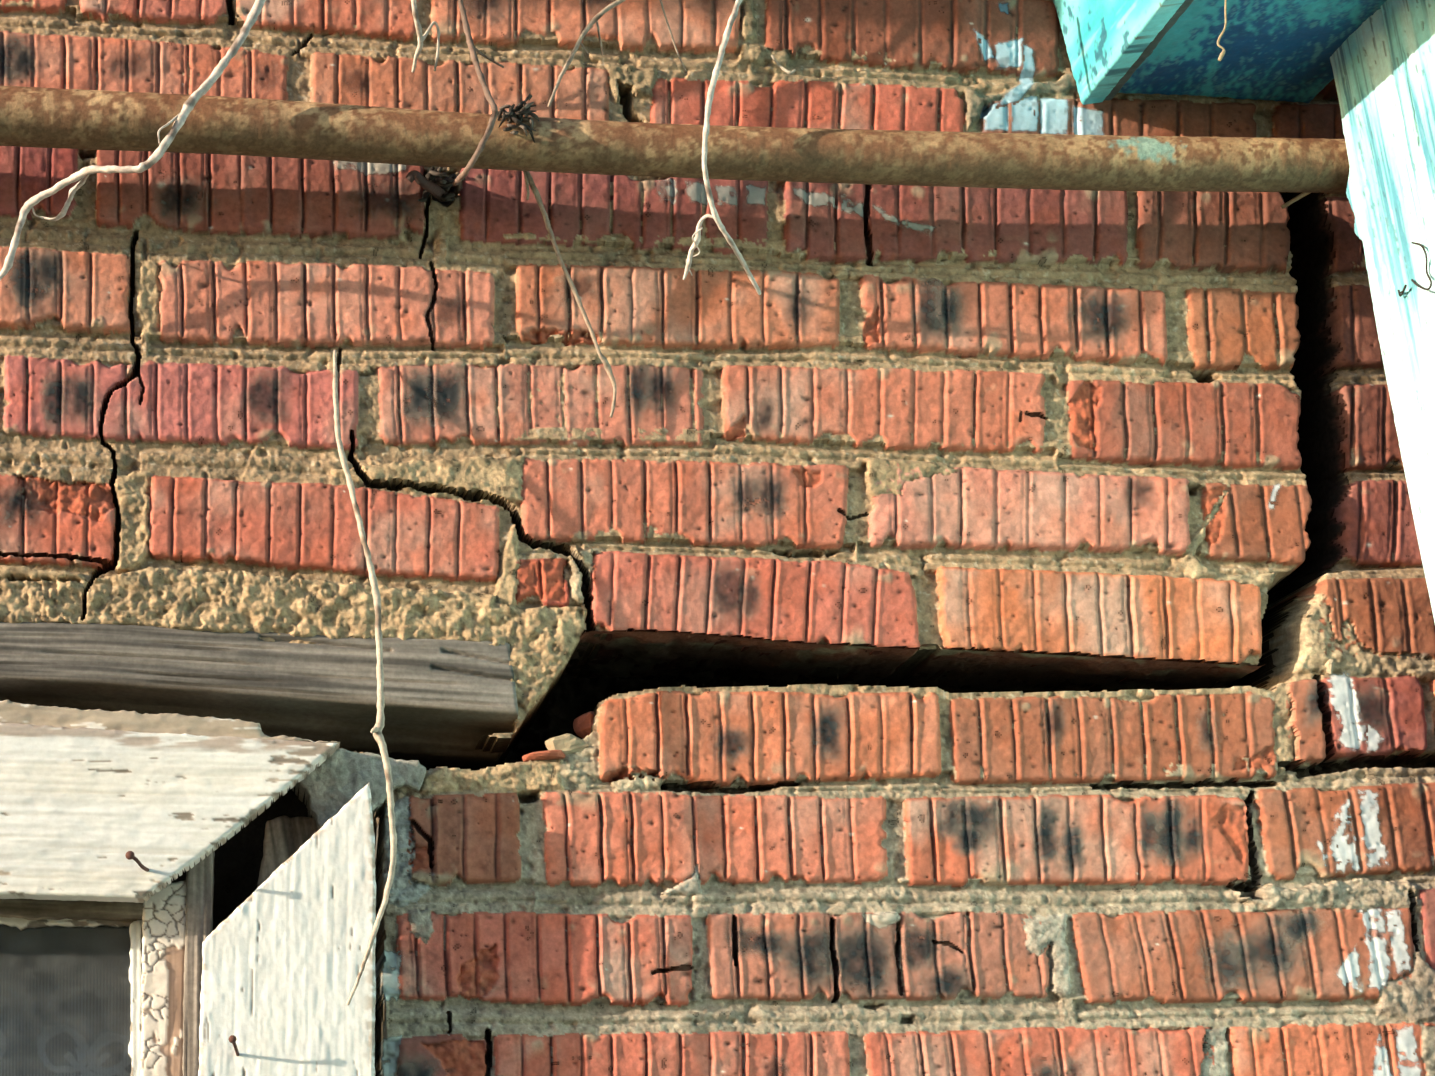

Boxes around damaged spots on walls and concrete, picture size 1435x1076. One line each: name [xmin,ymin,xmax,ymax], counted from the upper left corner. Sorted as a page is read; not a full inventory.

crack [0,205,161,621]
crack [337,172,1435,931]
crack [651,899,750,1047]
crack [726,897,778,1006]
crack [823,917,858,1032]
crack [885,925,963,996]
crack [1382,871,1420,959]
crack [387,1007,493,1076]
spalling [423,1041,486,1076]
crack [552,1056,613,1072]
crack [1182,1016,1225,1064]
crack [1334,1009,1395,1060]